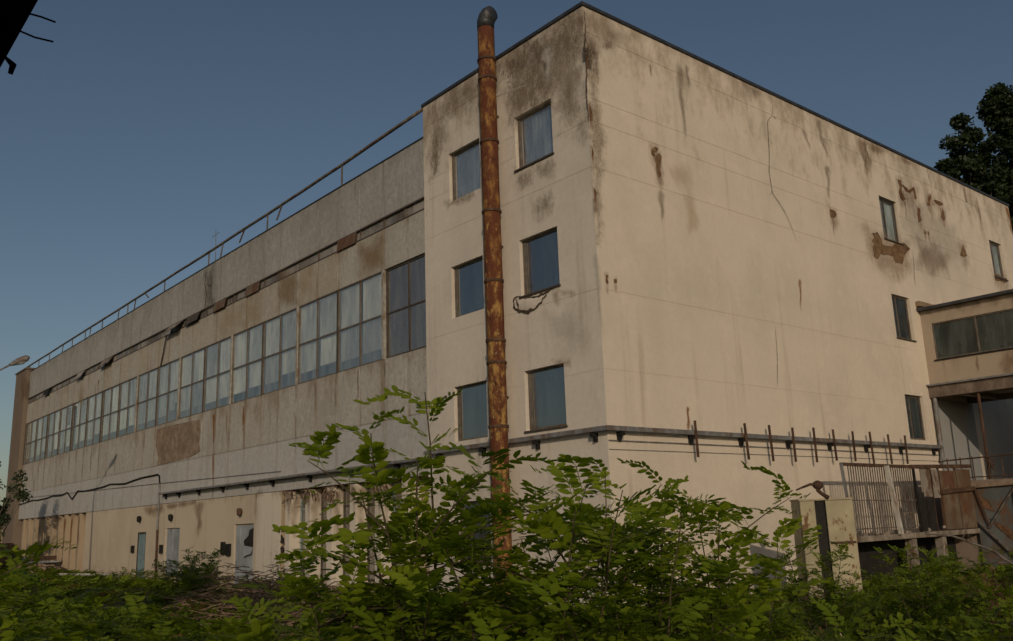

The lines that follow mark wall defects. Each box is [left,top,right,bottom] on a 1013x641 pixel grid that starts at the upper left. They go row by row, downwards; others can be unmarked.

peeling [898,180,945,235]
spalling [872,232,910,264]